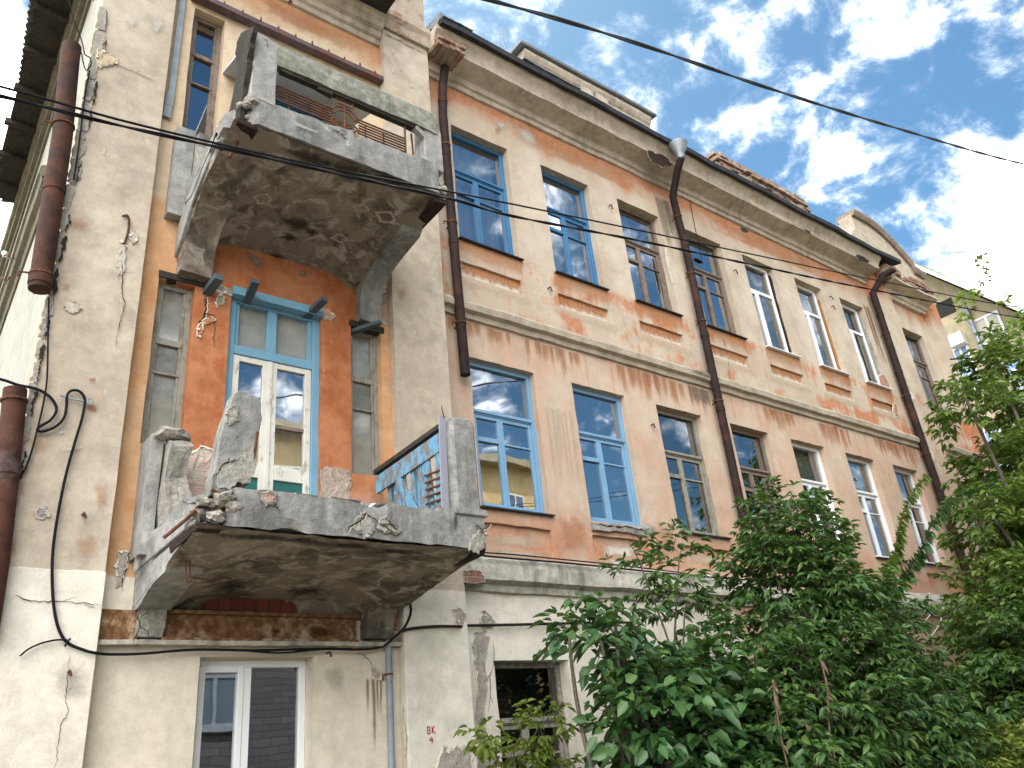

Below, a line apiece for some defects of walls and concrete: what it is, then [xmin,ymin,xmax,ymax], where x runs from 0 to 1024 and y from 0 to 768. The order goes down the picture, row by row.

spalling [647,150,673,168]
spalling [21,6,118,473]
crack [116,251,132,348]
spalling [196,285,237,338]
spalling [162,445,272,539]
peeling [114,550,128,588]
water stain [222,535,322,558]
water stain [335,544,415,569]
spalling [353,510,402,539]
crack [16,595,98,608]
corrosion [366,680,382,730]
peeling [435,607,498,768]